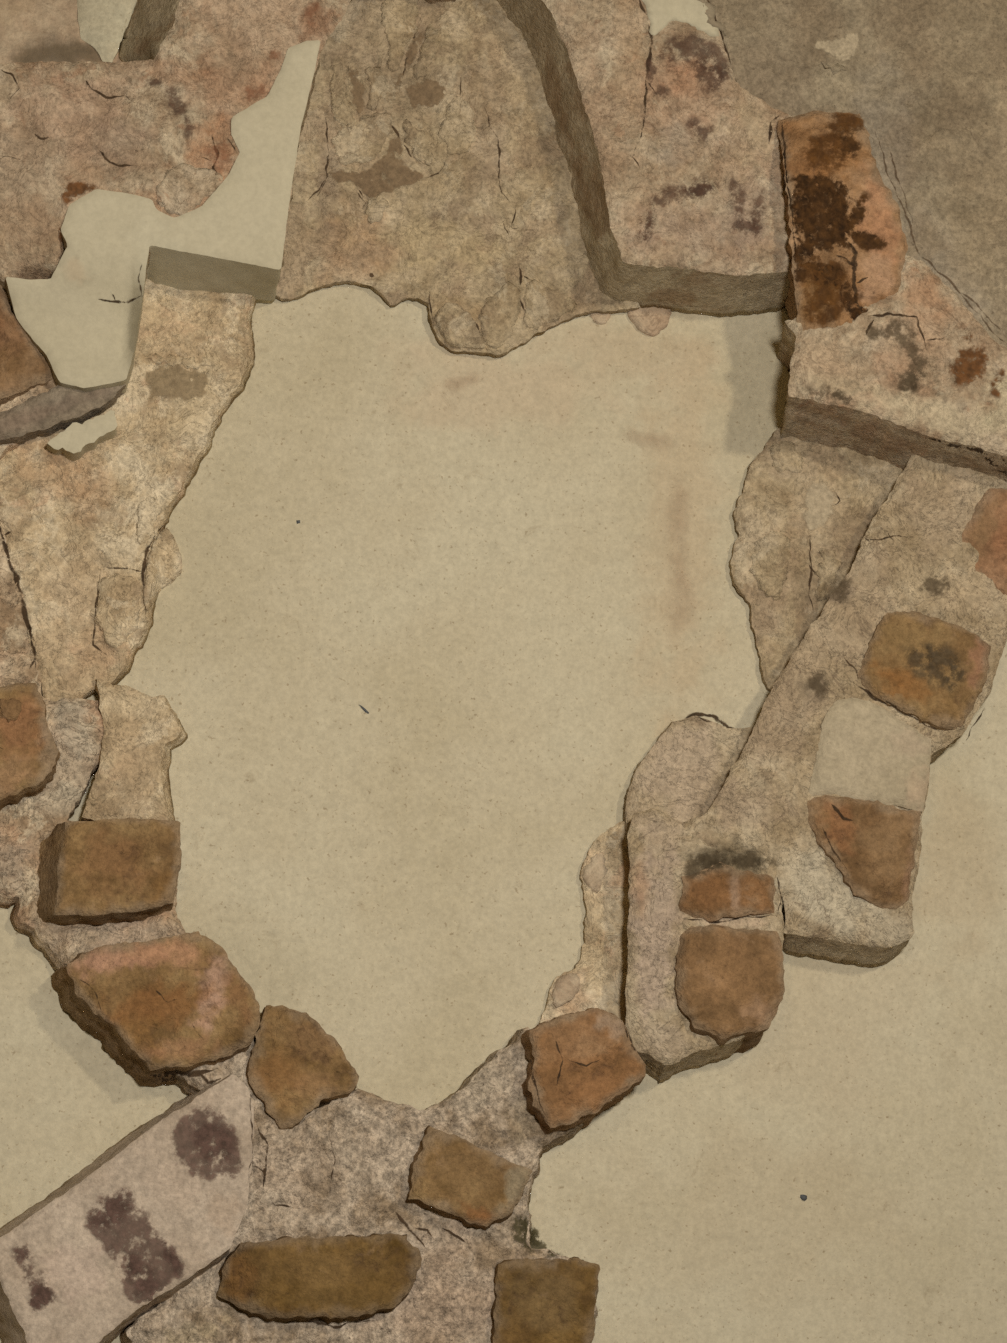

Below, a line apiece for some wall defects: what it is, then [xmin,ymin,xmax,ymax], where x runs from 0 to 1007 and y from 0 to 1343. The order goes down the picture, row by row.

spalling [642,0,726,37]
spalling [814,33,859,75]
spalling [330,0,477,224]
spalling [156,163,223,215]
corrosion [790,113,887,326]
flaking render [435,279,611,350]
flaking render [627,307,672,337]
spalling [146,353,213,400]
crack [0,527,36,667]
spalling [749,530,791,601]
damp [174,1107,241,1179]
damp [86,1189,183,1303]